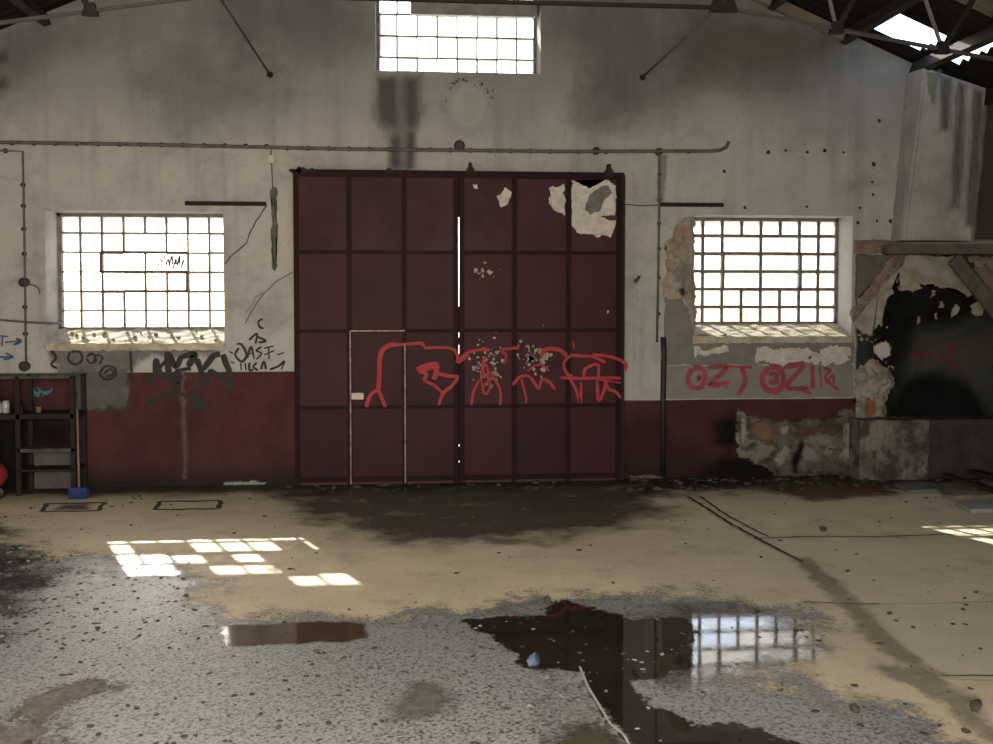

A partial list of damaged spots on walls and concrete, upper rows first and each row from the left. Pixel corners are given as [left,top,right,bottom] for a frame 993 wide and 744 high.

peeling [497,188,512,207]
peeling [549,180,617,238]
leakage [927,71,993,240]
flaking render [661,217,697,330]
flaking render [968,255,993,295]
flaking render [735,239,984,476]